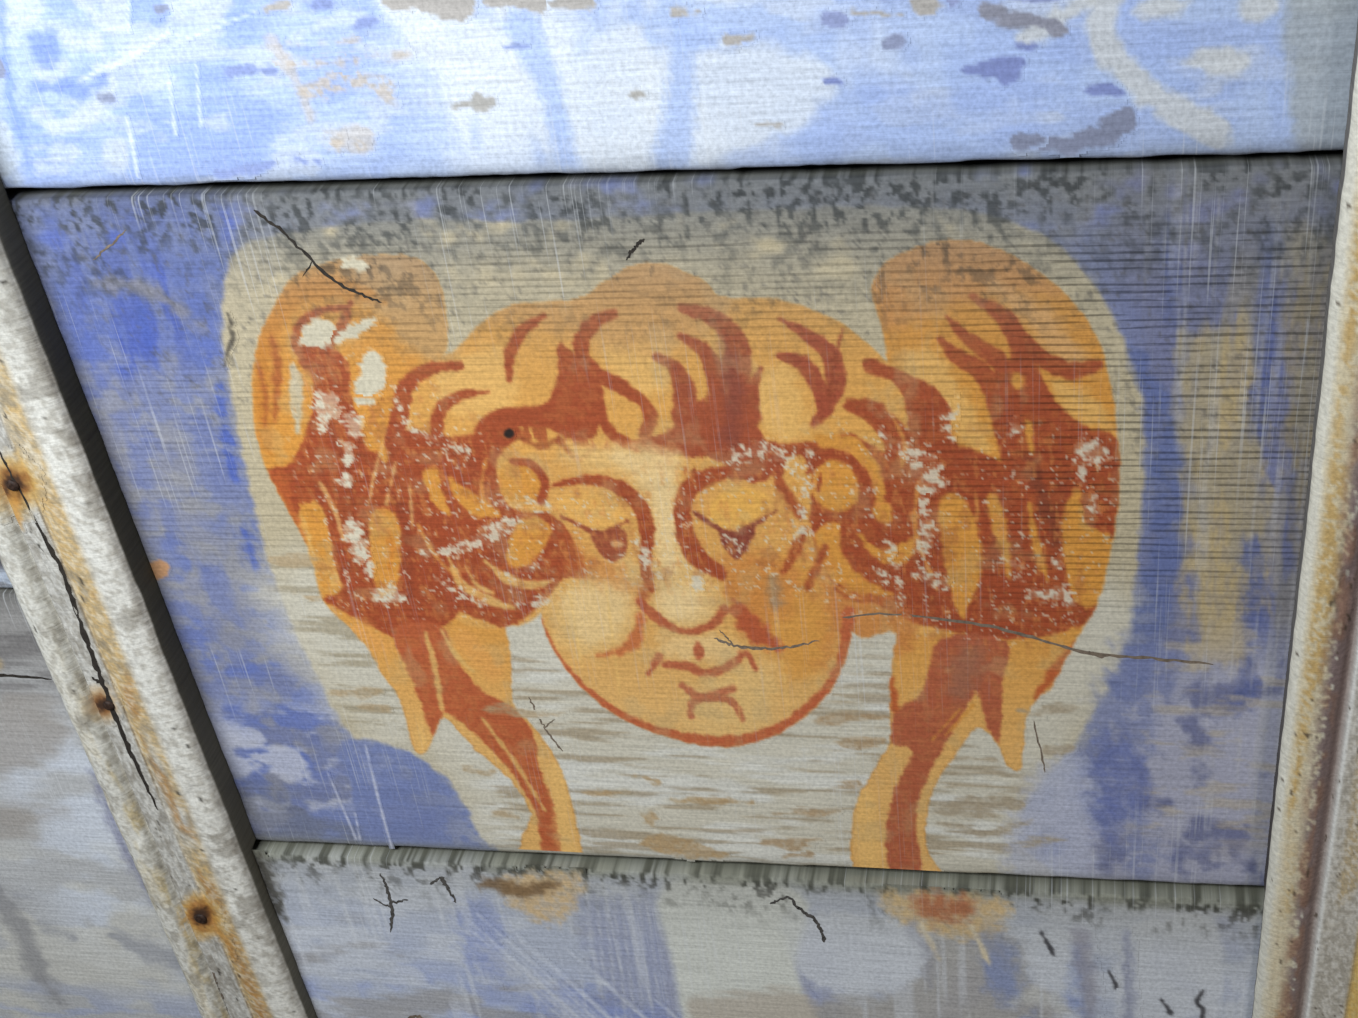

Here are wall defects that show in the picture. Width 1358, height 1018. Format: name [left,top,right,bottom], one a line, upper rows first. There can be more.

peeling [819,0,1070,91]
crack [254,210,382,303]
peeling [295,314,472,489]
corrosion [0,444,47,534]
peeling [870,392,961,619]
peeling [338,510,412,609]
peeling [417,493,562,616]
crack [0,452,158,810]
crack [714,630,818,650]
crack [843,612,1213,665]
corrosion [77,681,125,728]
corrosion [172,885,238,961]